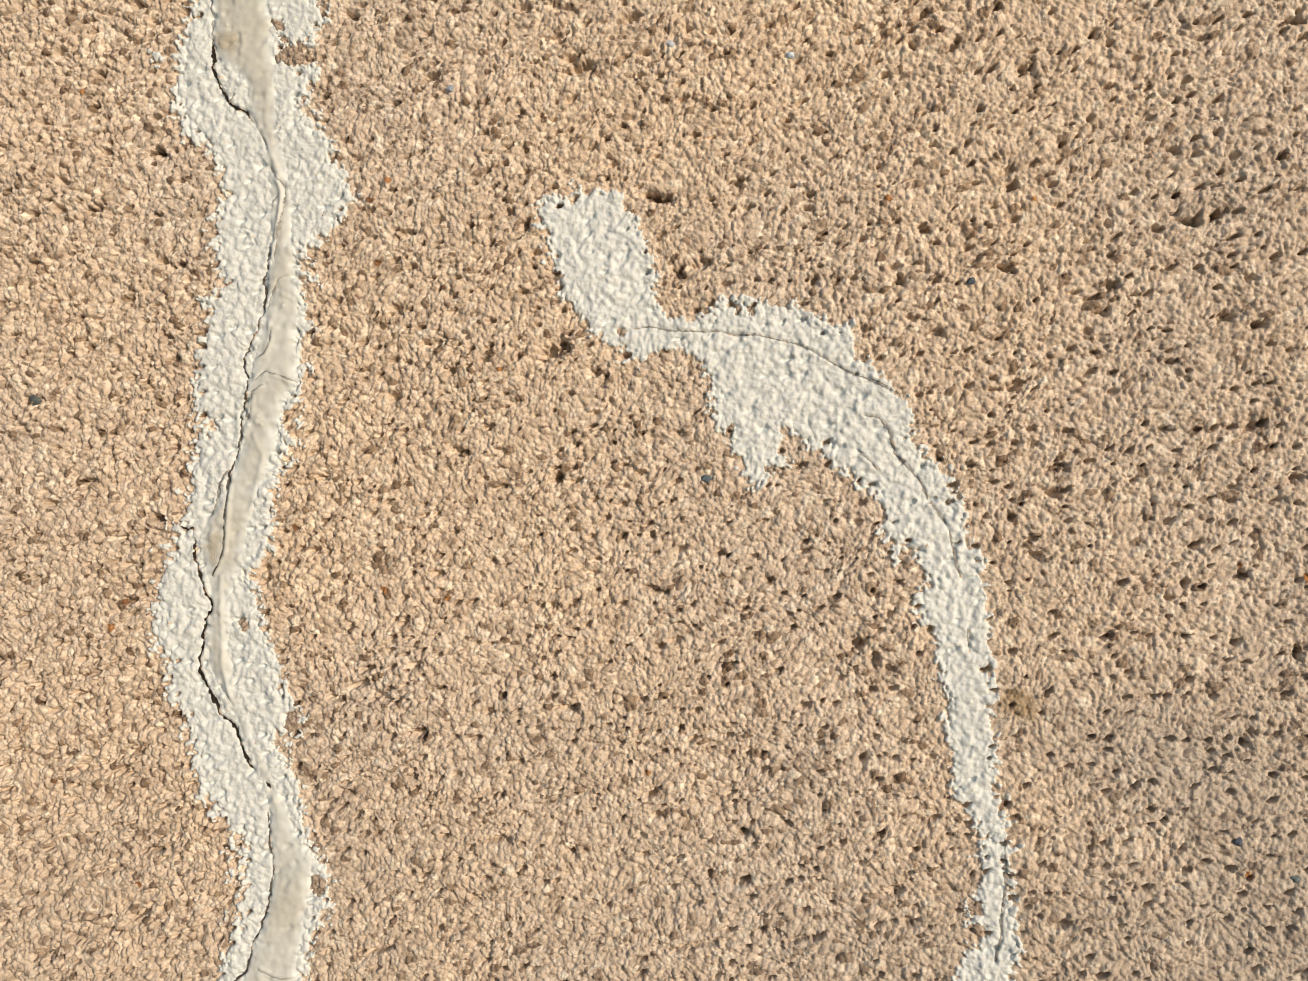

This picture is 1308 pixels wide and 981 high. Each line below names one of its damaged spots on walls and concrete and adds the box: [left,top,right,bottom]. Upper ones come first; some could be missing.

crack [181,0,296,981]